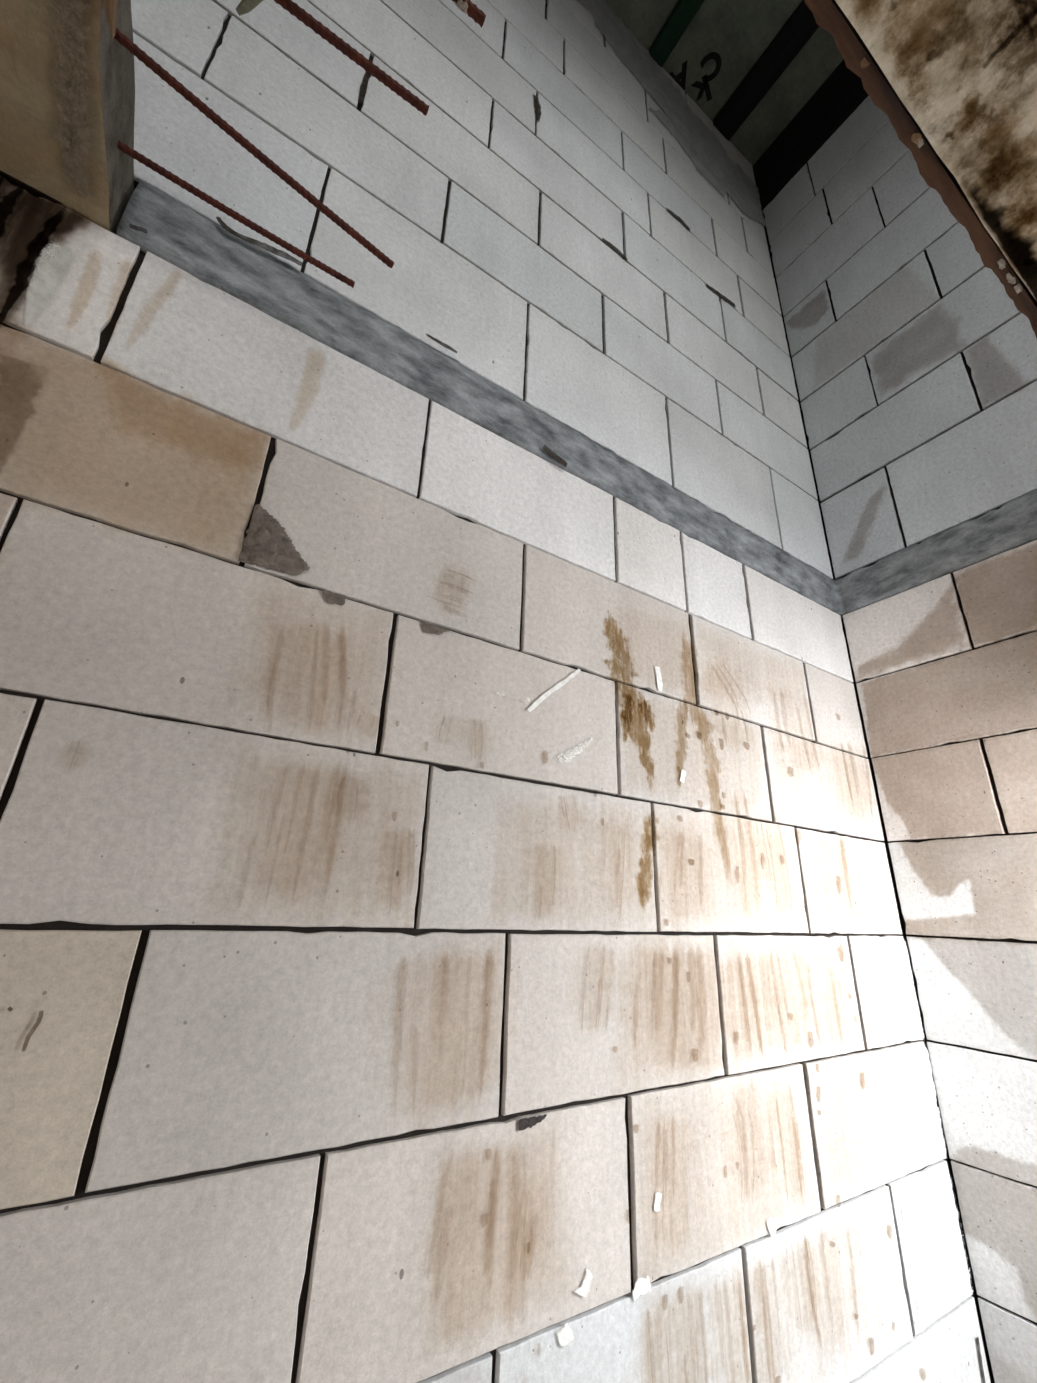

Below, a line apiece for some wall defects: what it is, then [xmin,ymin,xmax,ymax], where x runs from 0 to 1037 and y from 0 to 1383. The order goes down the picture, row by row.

spalling [274,0,429,116]
spalling [452,0,486,28]
crack [984,0,1037,68]
spalling [114,28,394,288]
water stain [0,178,78,328]